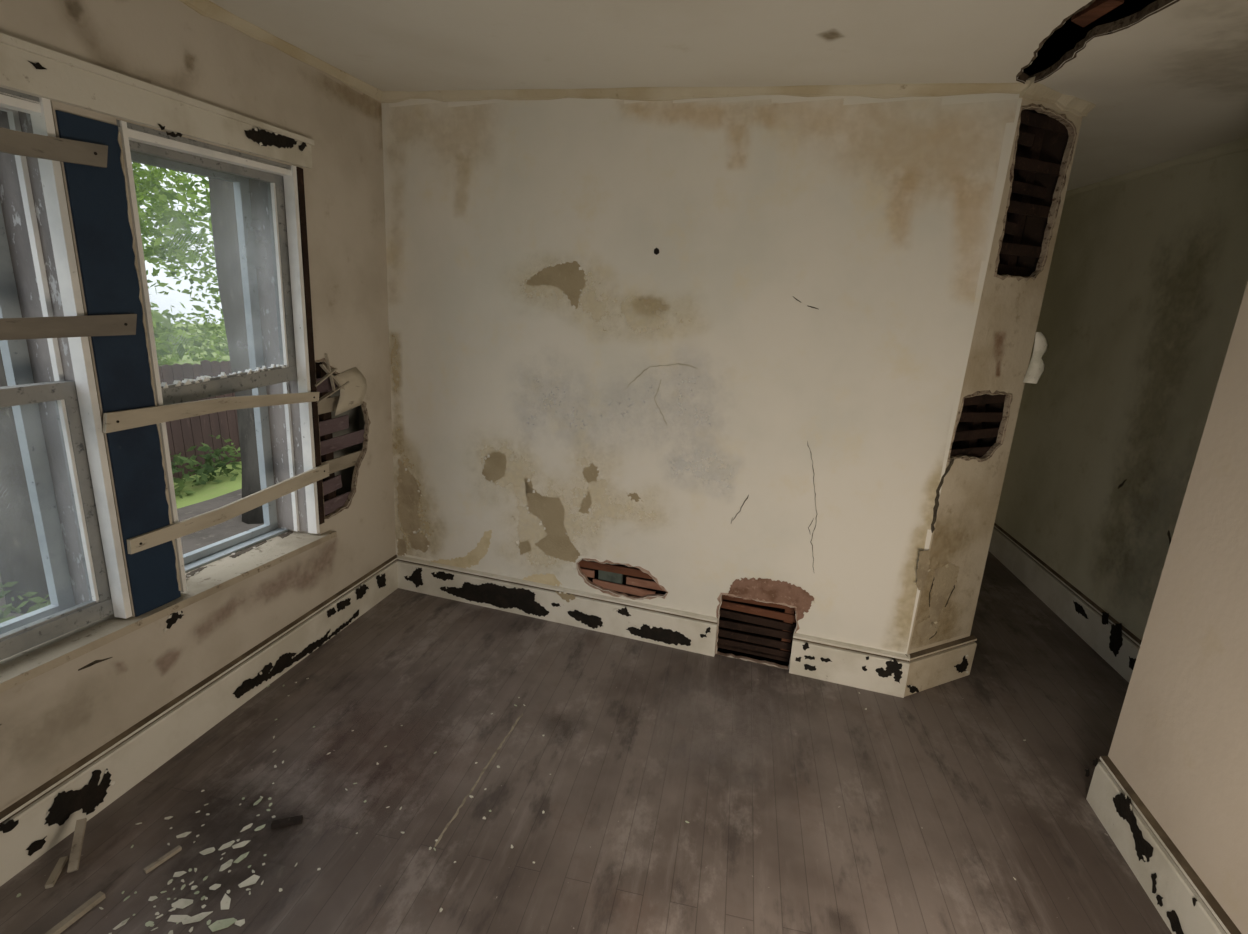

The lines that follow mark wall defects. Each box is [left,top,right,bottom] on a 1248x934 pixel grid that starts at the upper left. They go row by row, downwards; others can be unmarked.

spalling [994,103,1077,282]
peeling [525,260,586,309]
spalling [315,353,371,519]
peeling [482,451,507,482]
peeling [229,530,293,558]
spalling [396,459,832,671]
spalling [164,610,183,632]
spalling [233,573,386,698]
spalling [1073,601,1136,670]
spalling [0,819,19,833]
spalling [26,769,115,856]
spalling [1113,792,1184,934]